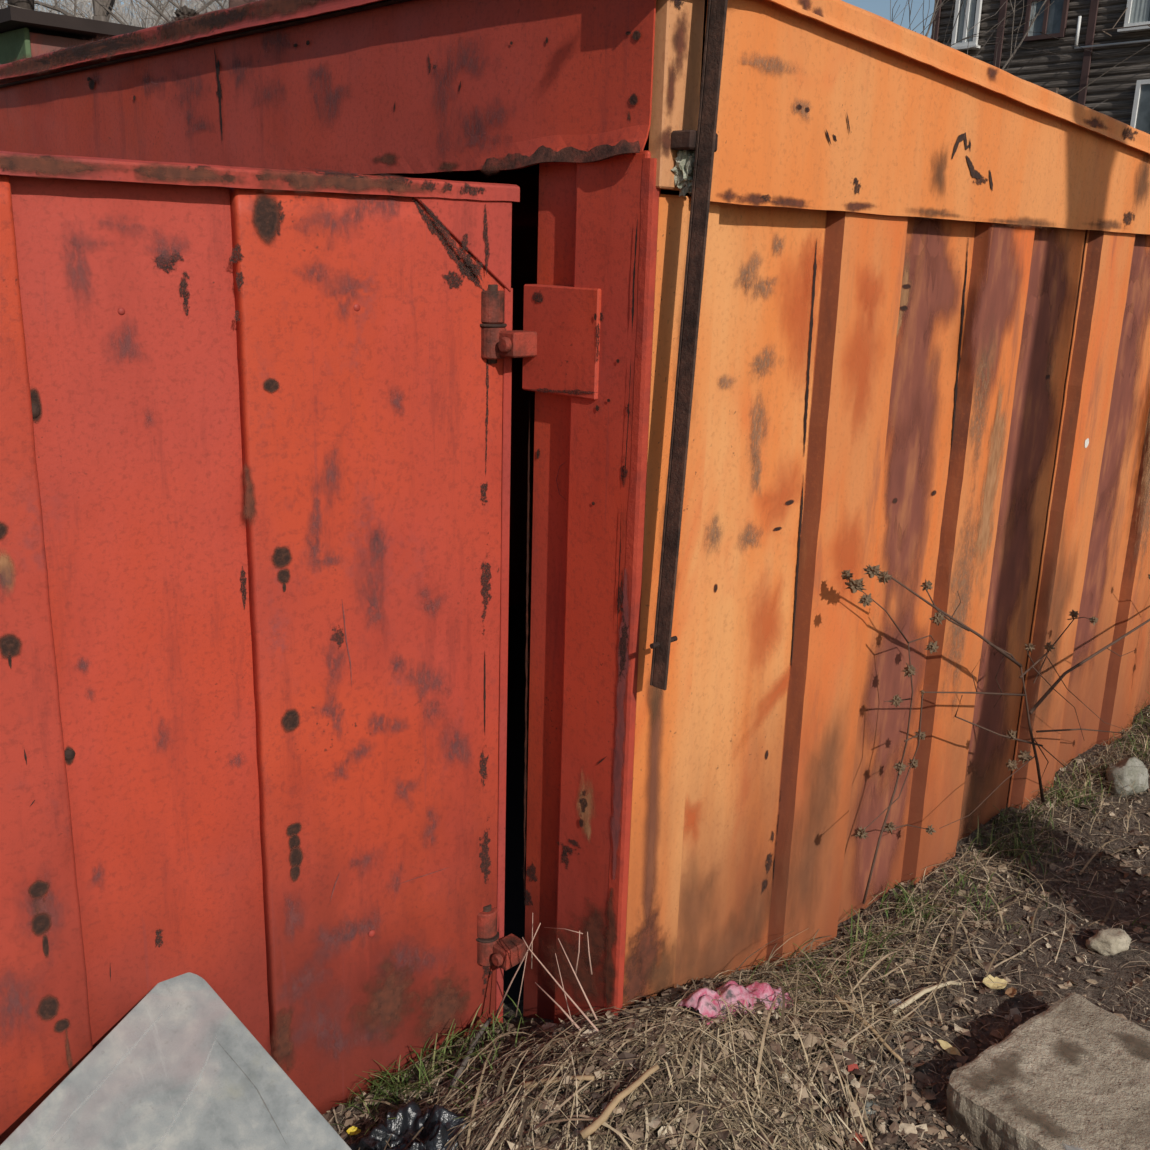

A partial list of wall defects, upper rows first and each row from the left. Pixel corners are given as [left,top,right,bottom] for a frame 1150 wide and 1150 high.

rust [0,155,100,175]
rust [135,164,236,183]
rust [934,157,946,190]
rust [253,169,422,244]
rust [272,547,292,592]
rust [282,709,299,732]
rust [287,823,303,882]
rust [549,685,673,1009]
rust [29,880,55,957]